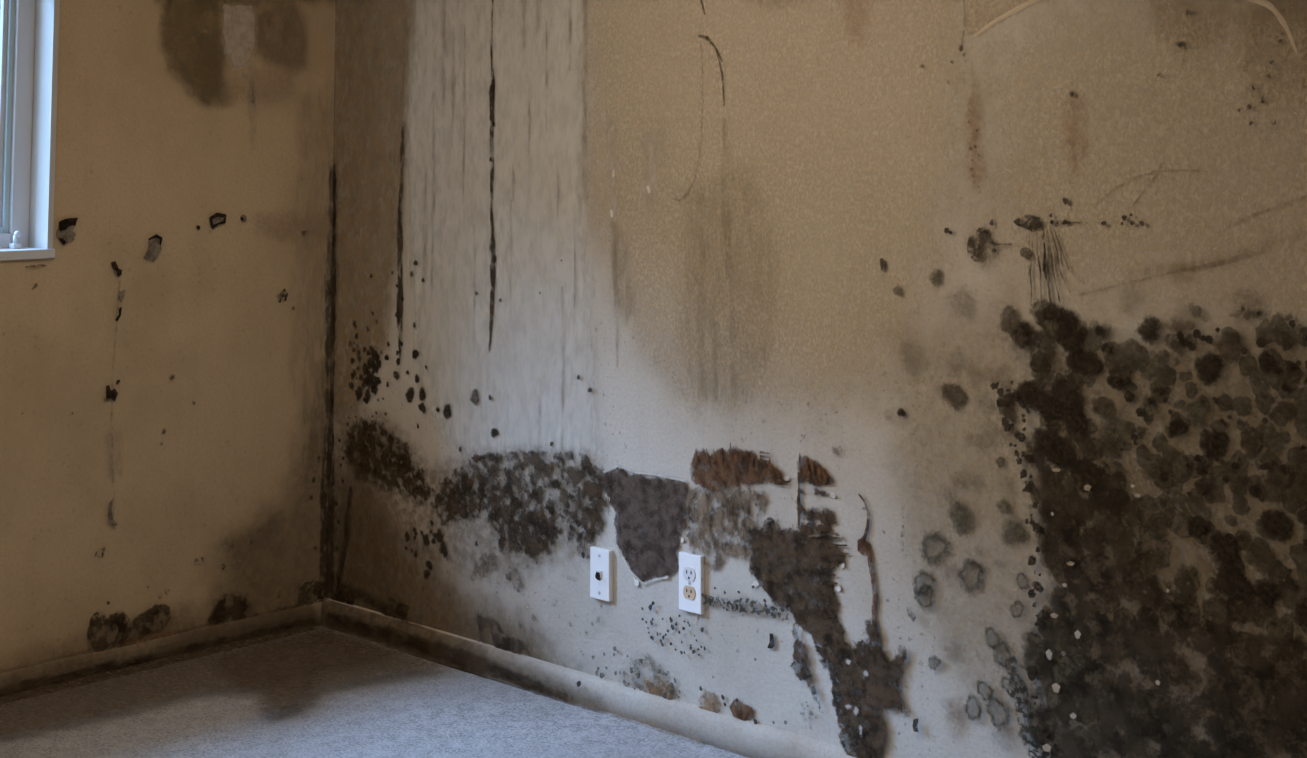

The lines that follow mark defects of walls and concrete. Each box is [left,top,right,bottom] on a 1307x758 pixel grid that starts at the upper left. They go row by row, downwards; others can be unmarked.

water stain [0,0,607,735]
water stain [587,0,1029,405]
water stain [897,0,1307,758]
water stain [581,601,706,700]
peeling [601,443,908,758]